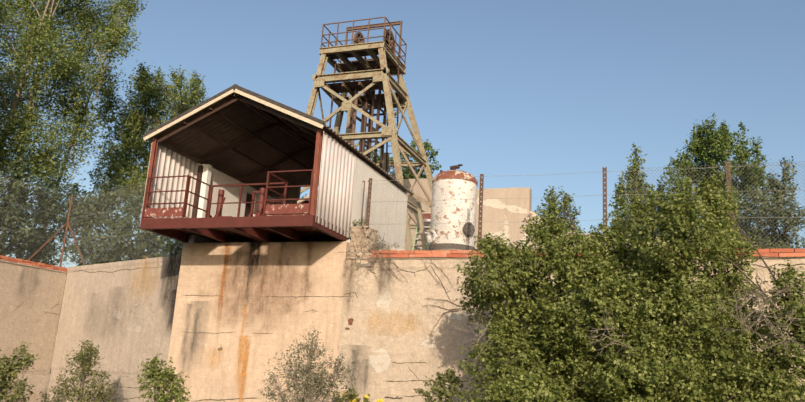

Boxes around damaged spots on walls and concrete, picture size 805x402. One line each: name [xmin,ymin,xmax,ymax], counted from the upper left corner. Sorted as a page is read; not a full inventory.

peeling [476,197,534,250]
damp [249,242,260,275]